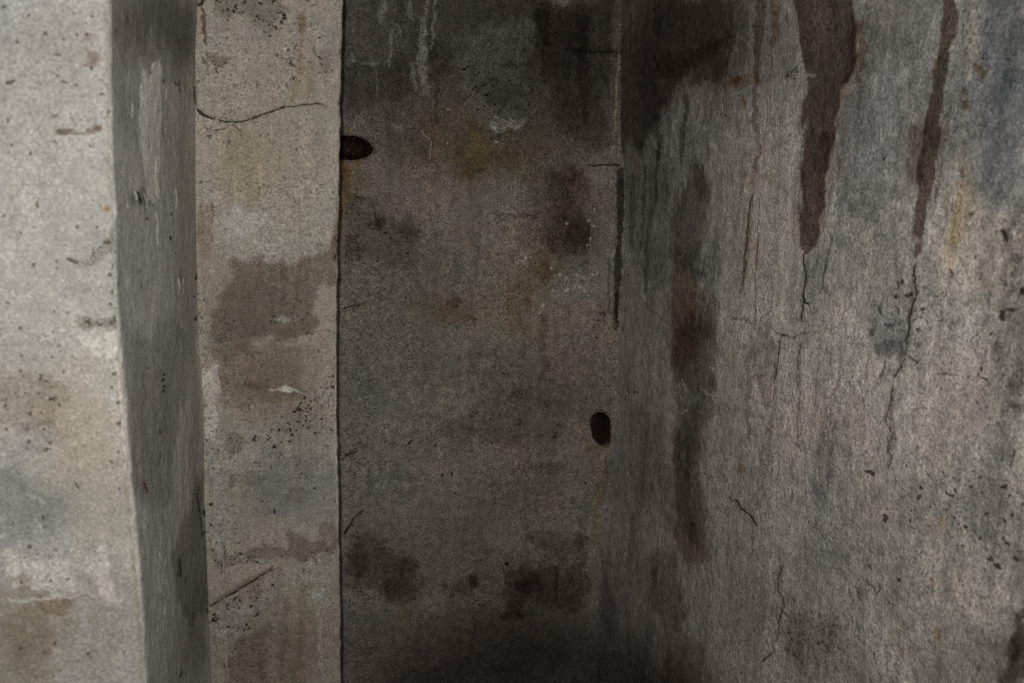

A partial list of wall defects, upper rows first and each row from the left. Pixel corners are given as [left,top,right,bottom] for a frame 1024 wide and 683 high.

crack [196,103,325,136]
damp [796,0,914,252]
crack [801,253,809,323]
crack [892,263,918,391]
efflorescence [269,384,303,394]